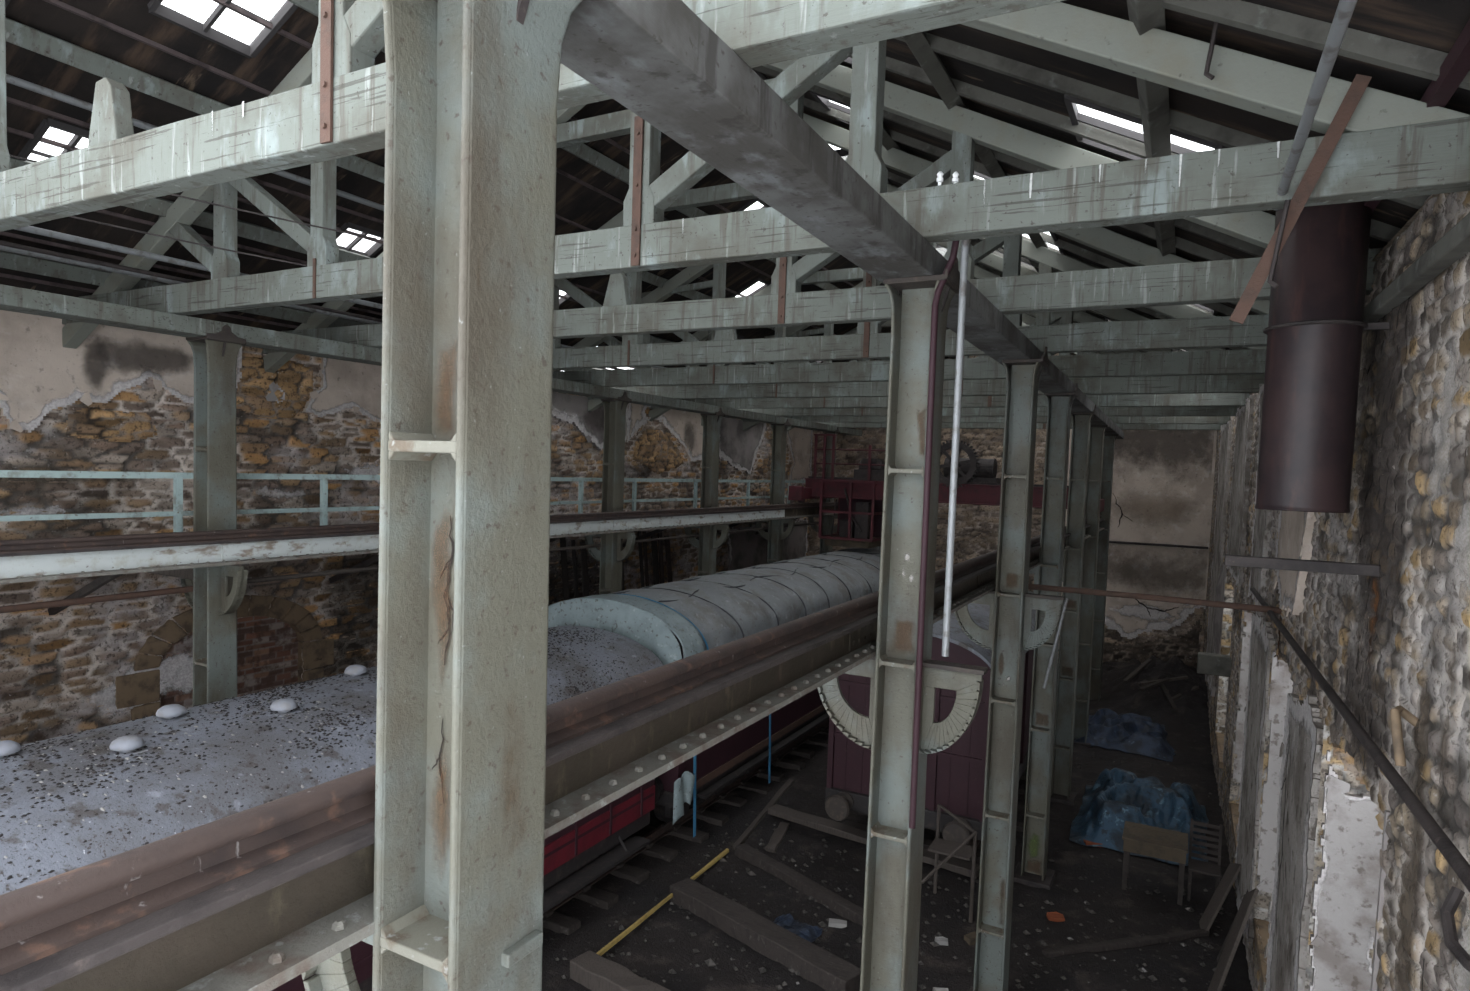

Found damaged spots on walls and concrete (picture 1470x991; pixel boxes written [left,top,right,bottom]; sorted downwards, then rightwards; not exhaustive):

peeling [0,310,194,442]
water stain [85,338,188,385]
peeling [236,347,382,424]
peeling [552,392,604,450]
peeling [625,403,767,474]
peeling [786,428,814,485]
crack [438,516,454,665]
peeling [1102,421,1233,697]
peeling [1233,384,1383,991]